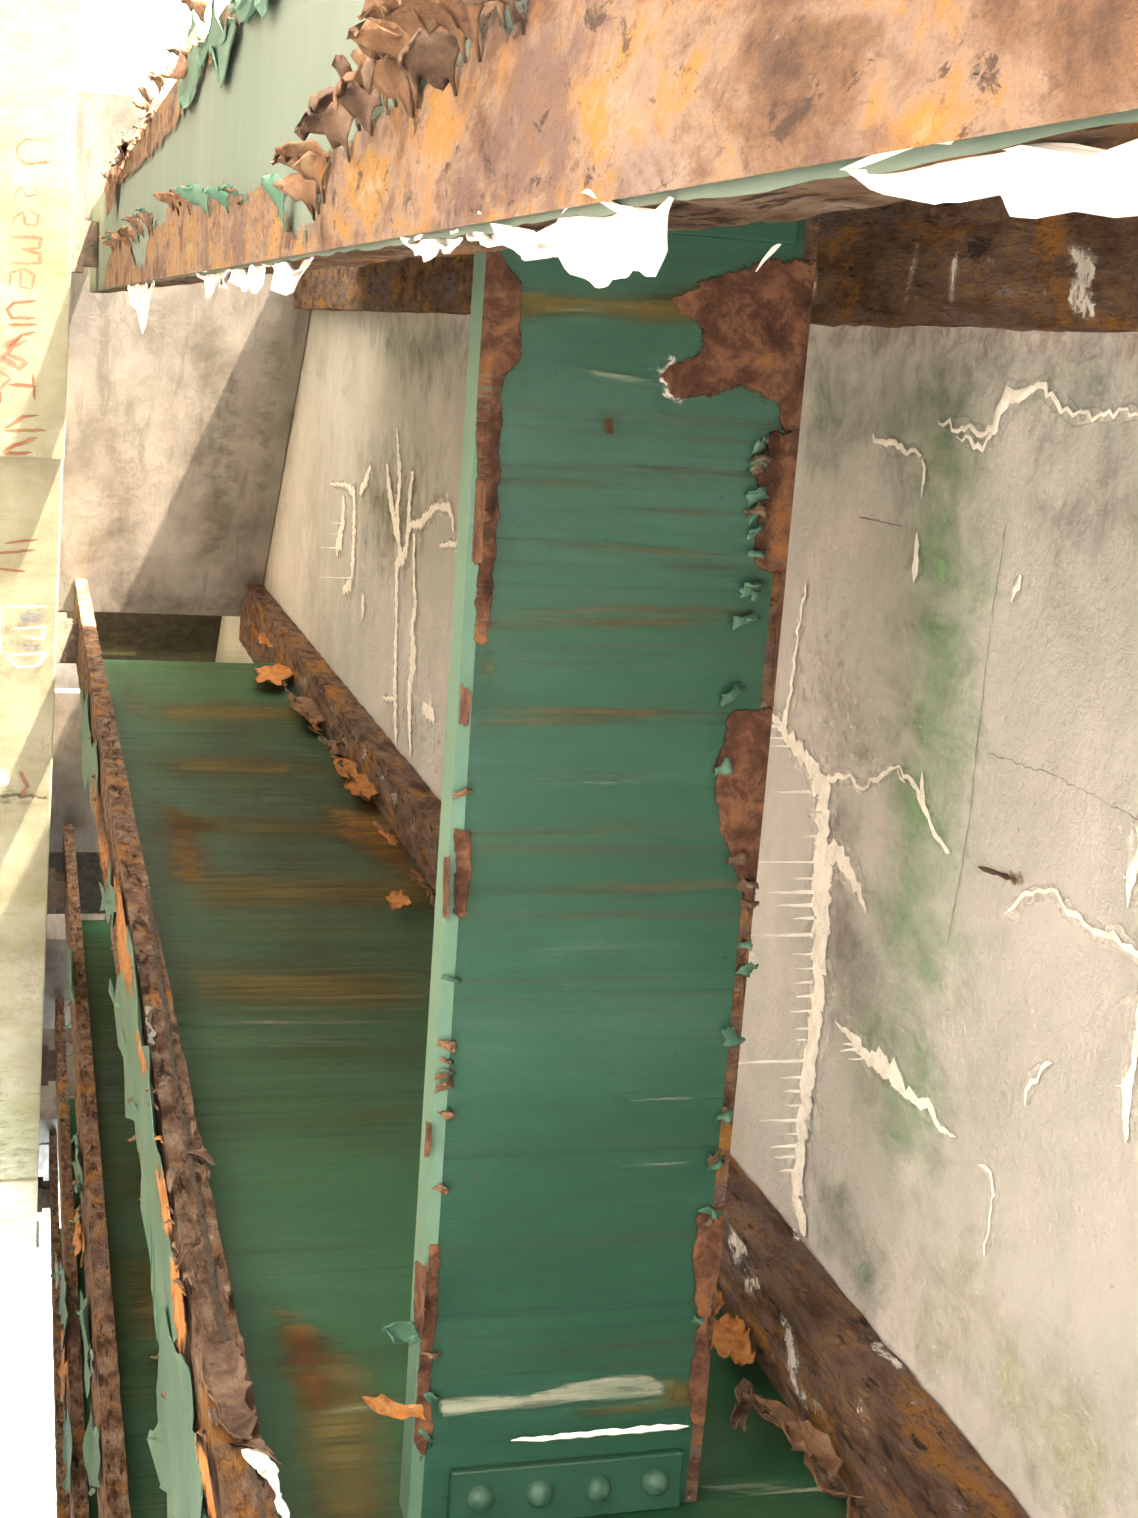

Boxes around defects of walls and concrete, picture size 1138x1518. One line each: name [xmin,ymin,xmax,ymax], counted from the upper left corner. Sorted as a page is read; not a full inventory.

peeling [196,257,314,299]
peeling [400,189,674,288]
corrosion [99,0,1138,289]
peeling [839,139,1138,219]
crack [321,428,457,755]
corrosion [471,251,816,1103]
crack [872,378,1138,583]
peeling [78,685,216,1518]
corrosion [442,828,472,921]
crack [739,582,998,1255]
crack [1005,823,1138,1143]
corrosion [194,1333,290,1518]